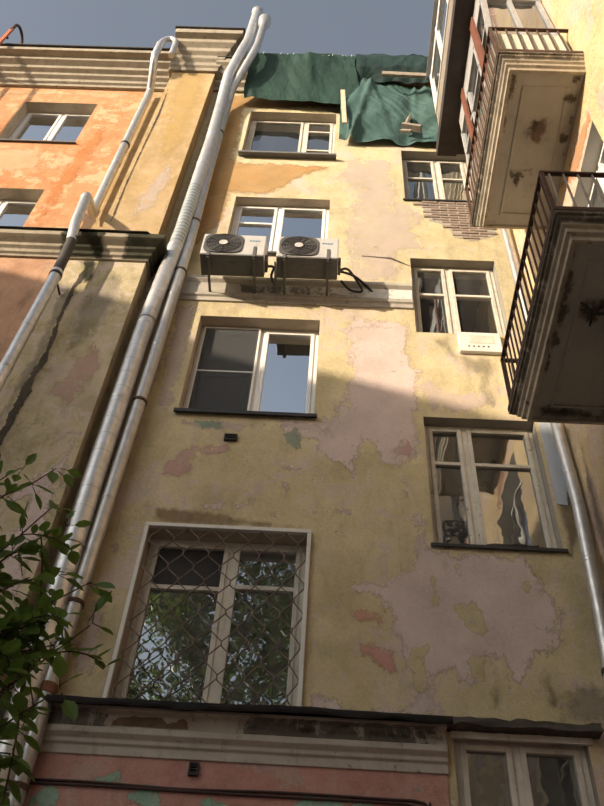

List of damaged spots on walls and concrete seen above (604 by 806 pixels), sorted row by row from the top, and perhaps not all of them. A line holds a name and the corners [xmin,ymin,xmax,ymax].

peeling [276,160,497,300]
peeling [280,316,488,483]
leakage [157,509,217,522]
peeling [350,509,563,715]
peeling [311,694,351,710]
spalling [106,715,188,729]
peeling [93,770,121,788]
peeling [29,776,60,806]
peeling [127,783,160,806]
peeling [294,792,373,806]